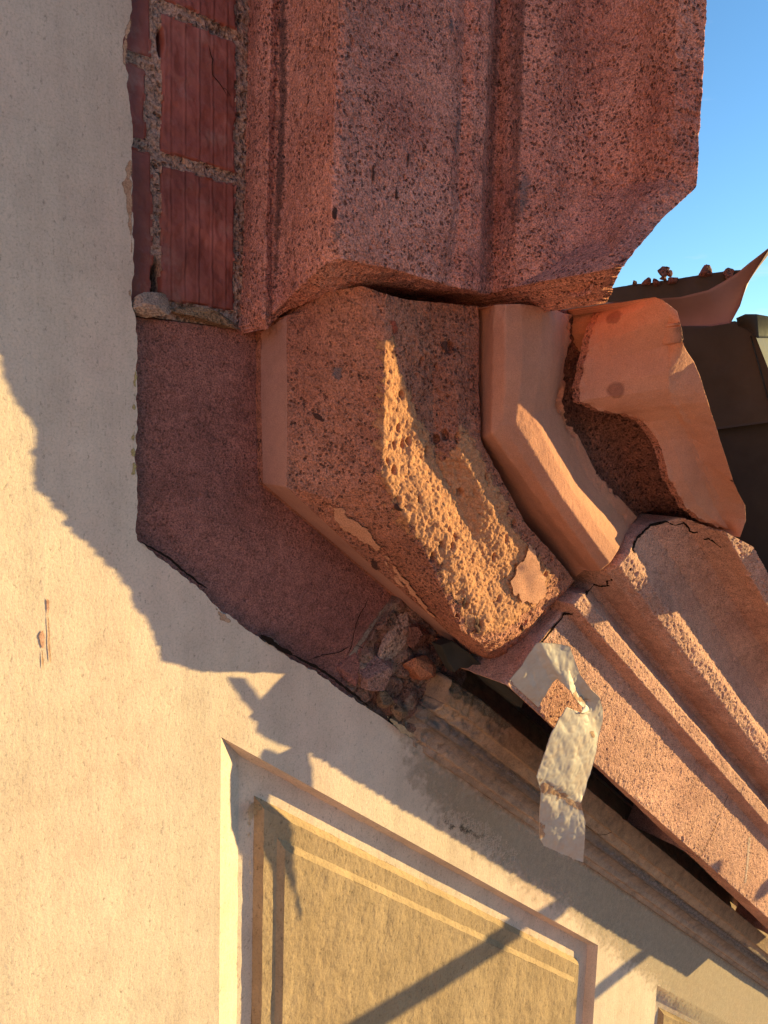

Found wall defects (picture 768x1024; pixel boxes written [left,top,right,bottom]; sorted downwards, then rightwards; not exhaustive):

spalling [329,505,466,737]
spalling [371,336,552,635]
crack [540,521,721,643]
spalling [572,312,722,528]